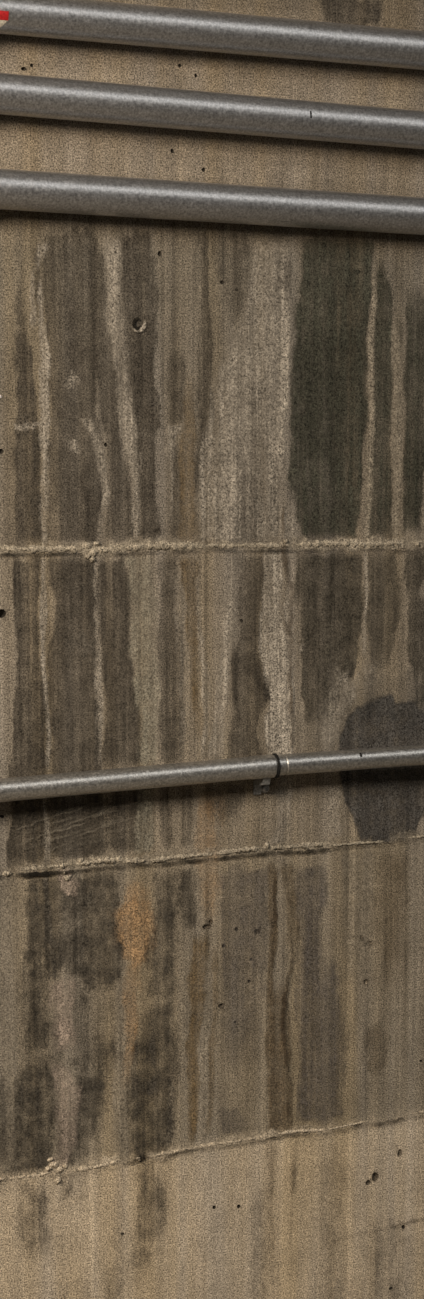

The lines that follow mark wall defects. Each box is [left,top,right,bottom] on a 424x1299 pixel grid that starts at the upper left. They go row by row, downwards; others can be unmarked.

water stain [15,231,172,539]
water stain [179,240,424,540]
water stain [9,560,184,777]
water stain [202,552,424,755]
water stain [0,793,186,1170]
water stain [144,872,195,989]